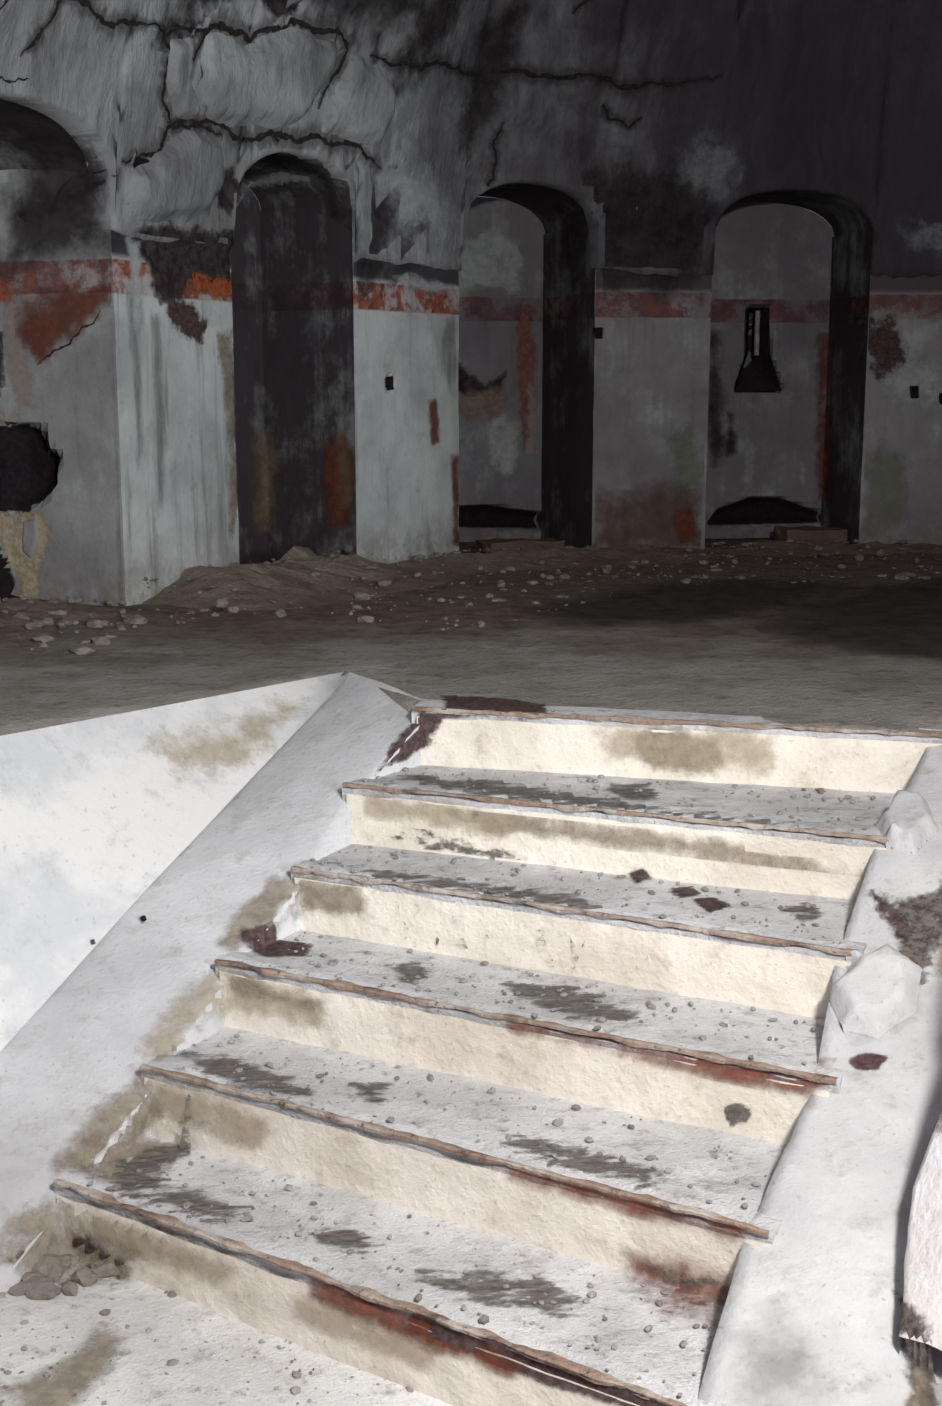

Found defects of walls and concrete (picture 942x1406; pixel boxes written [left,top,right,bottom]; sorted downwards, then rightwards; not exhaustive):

crack [0,0,723,186]
rust [0,279,111,360]
spalling [0,306,59,600]
spalling [875,790,939,854]
spalling [829,886,942,1040]
rust [311,1285,667,1406]